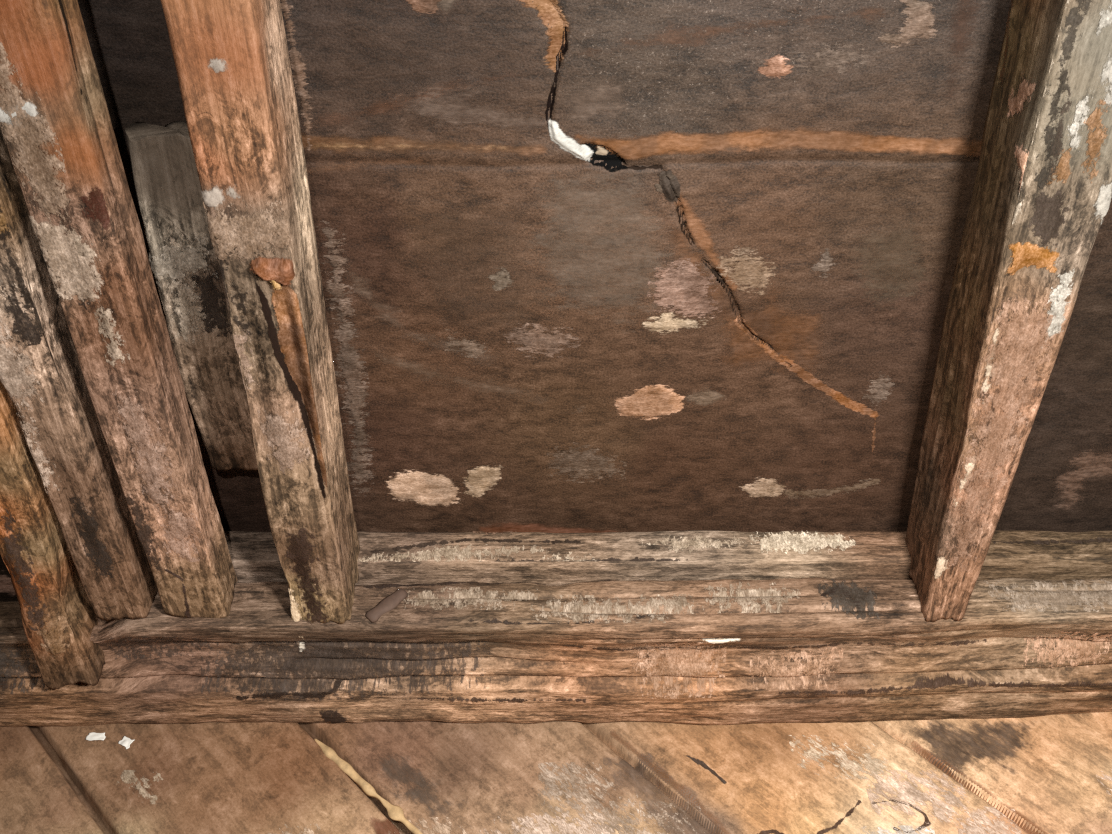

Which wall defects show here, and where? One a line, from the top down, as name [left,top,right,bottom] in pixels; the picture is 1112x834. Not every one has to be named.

peeling [280,0,313,150]
spalling [406,0,454,14]
spalling [519,0,569,72]
crack [545,27,568,128]
crack [623,165,878,452]
peeling [317,220,501,506]
peeling [615,384,723,420]